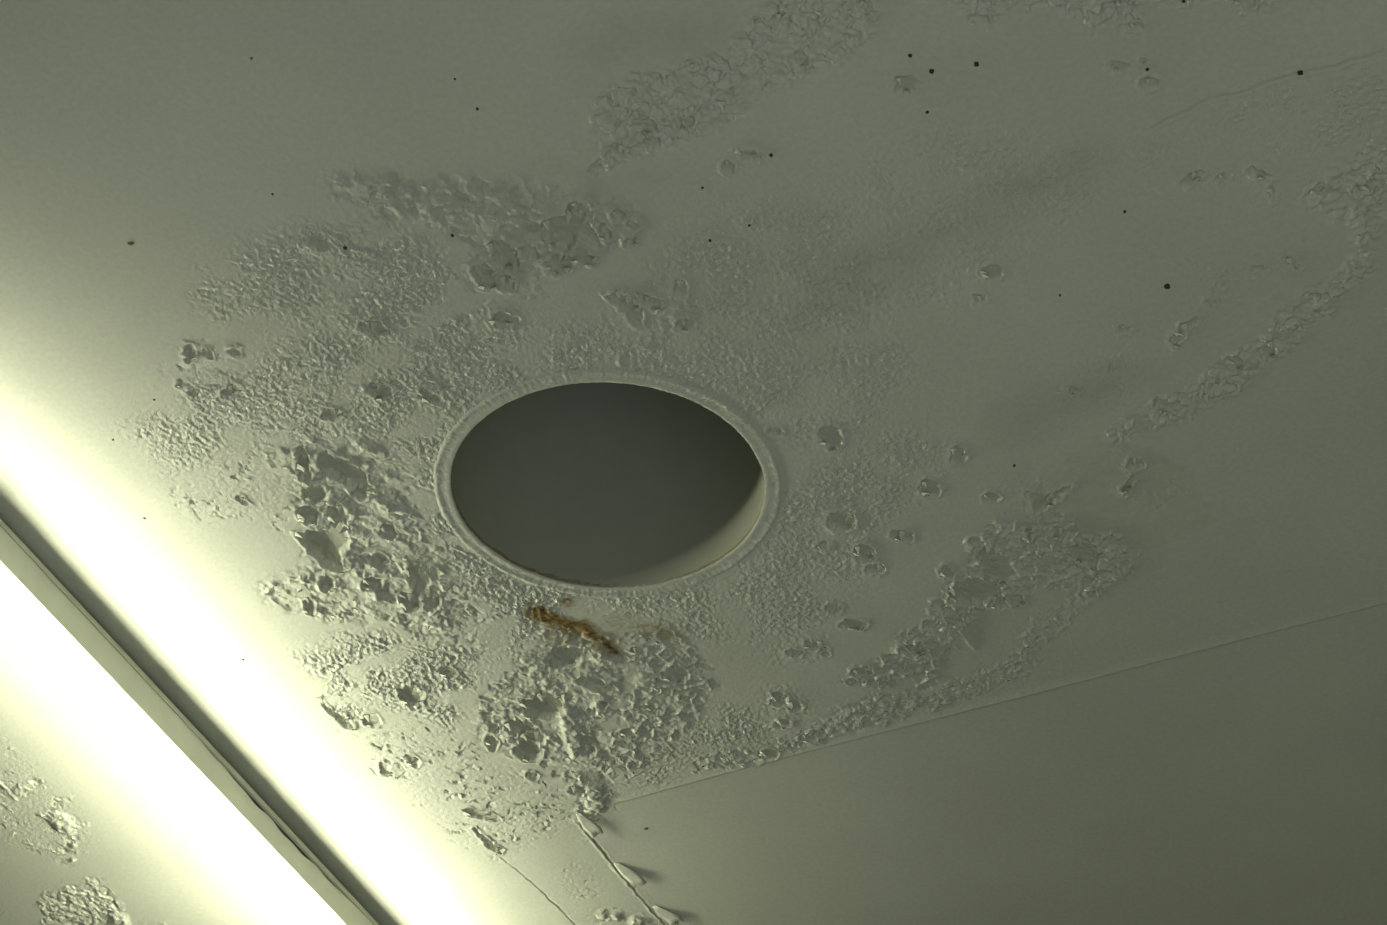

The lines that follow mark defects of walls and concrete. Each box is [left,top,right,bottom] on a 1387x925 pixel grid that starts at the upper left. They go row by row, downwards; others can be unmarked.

peeling [917,0,1287,103]
spalling [700,131,782,187]
spalling [304,158,661,308]
peeling [143,328,245,396]
rust [461,513,618,654]
spalling [153,427,730,877]
spalling [750,678,819,729]
peeling [0,718,136,925]
crack [509,865,582,925]
crack [576,812,683,925]